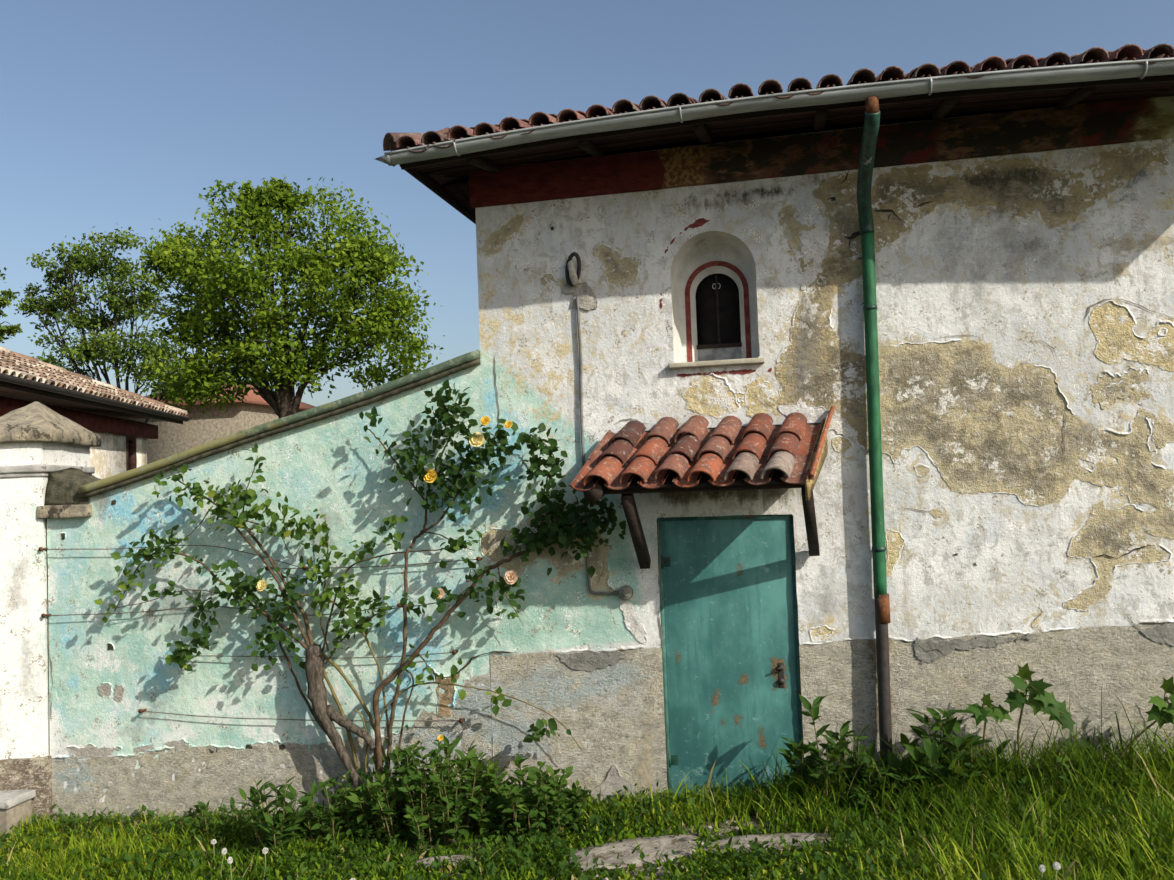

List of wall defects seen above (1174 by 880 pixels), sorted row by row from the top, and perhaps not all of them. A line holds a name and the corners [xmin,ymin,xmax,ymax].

peeling [872,162,964,186]
peeling [777,181,837,251]
peeling [1088,300,1174,339]
peeling [677,285,809,419]
peeling [811,405,948,485]
crack [1095,545,1155,558]
peeling [1062,534,1173,612]
peeling [561,623,647,653]
peeling [799,625,953,645]
peeling [970,621,1075,636]
spalling [428,664,469,718]
peeling [52,738,290,759]